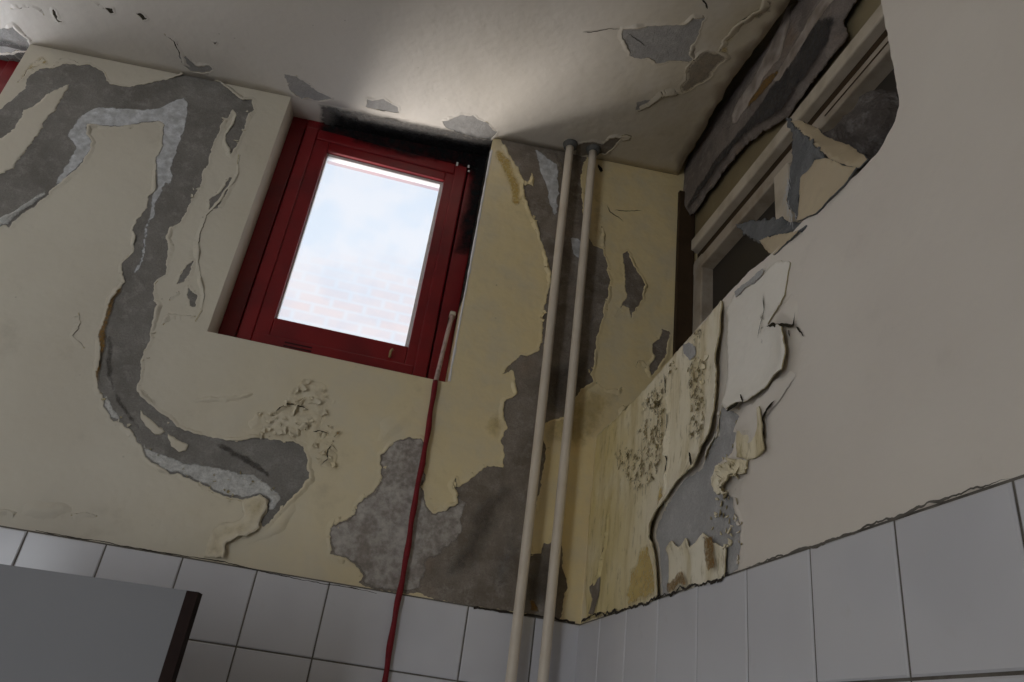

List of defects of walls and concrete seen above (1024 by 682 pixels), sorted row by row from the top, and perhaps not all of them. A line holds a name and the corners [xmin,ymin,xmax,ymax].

peeling [0,21,32,55]
peeling [282,72,334,102]
peeling [363,96,401,115]
peeling [440,112,500,140]
peeling [587,0,771,112]
peeling [0,54,315,558]
peeling [611,249,648,322]
water stain [325,140,613,620]
peeling [584,301,796,621]
crack [746,478,1009,567]